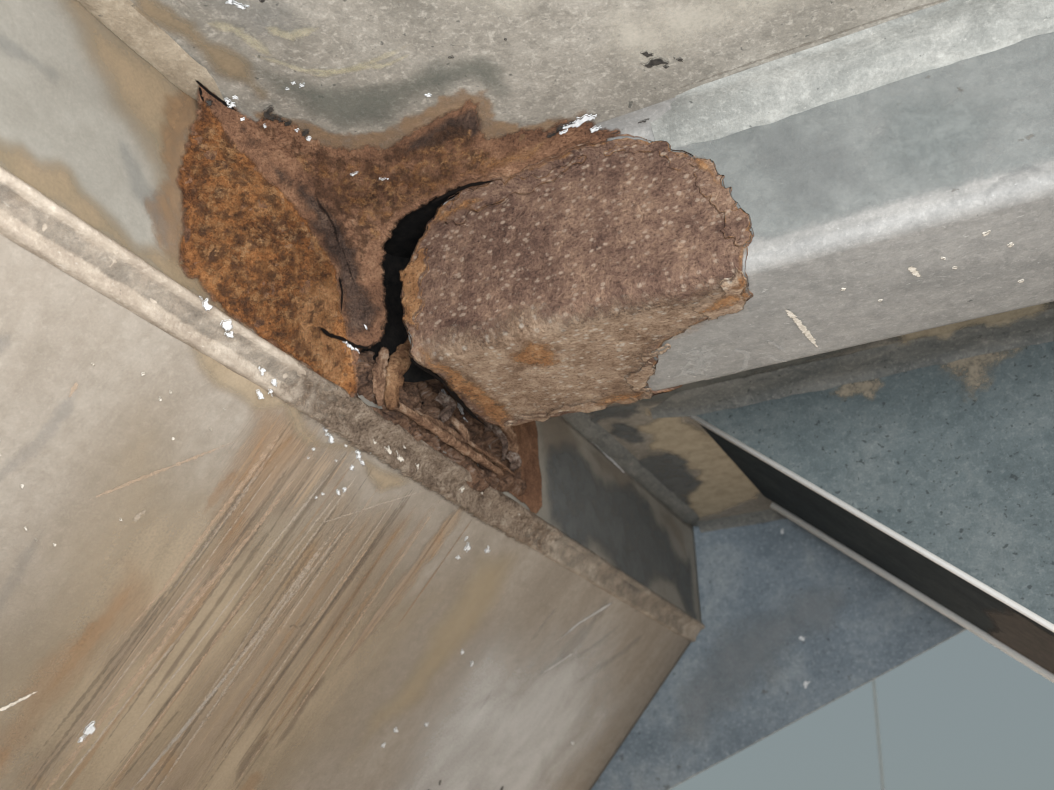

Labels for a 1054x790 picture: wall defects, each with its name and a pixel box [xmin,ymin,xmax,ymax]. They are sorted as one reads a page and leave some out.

crack [316,181,493,426]
rust [0,86,621,790]
peeling [323,429,406,471]